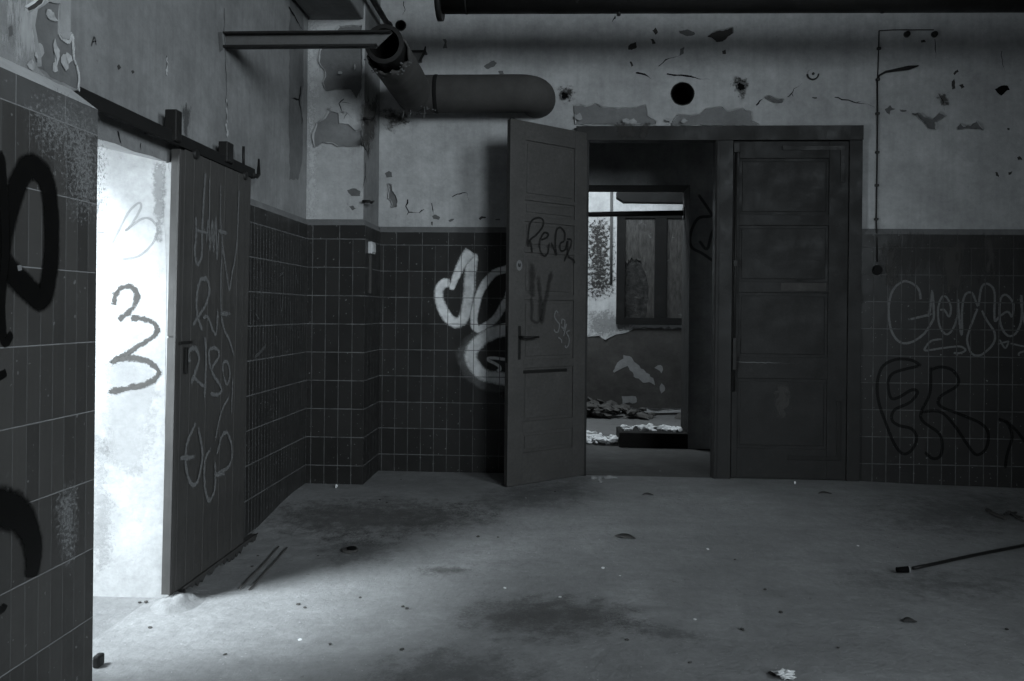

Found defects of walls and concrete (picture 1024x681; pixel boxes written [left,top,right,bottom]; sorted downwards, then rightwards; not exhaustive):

flaking render [25,0,81,92]
flaking render [679,27,734,55]
flaking render [318,49,363,98]
flaking render [312,106,362,147]
flaking render [559,77,759,126]
flaking render [885,106,947,130]
flaking render [587,327,682,411]